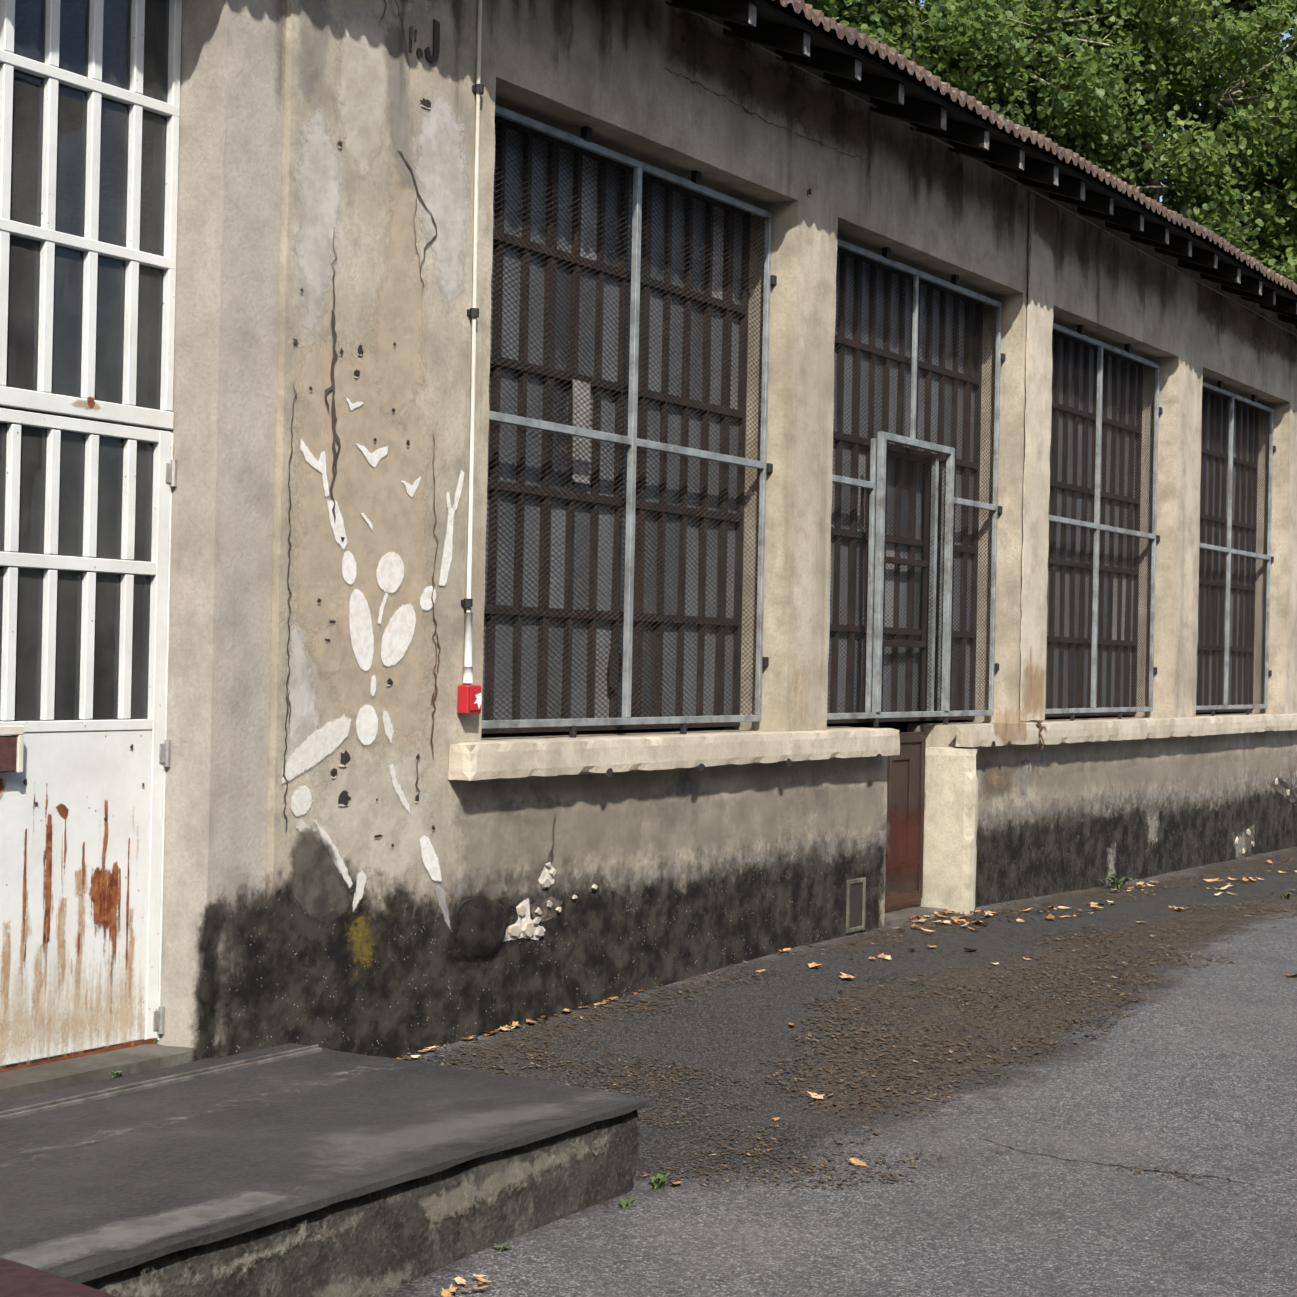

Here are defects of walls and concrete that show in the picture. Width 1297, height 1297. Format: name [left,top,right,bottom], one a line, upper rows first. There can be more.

crack [379,0,410,71]
peeling [295,0,429,331]
crack [397,150,438,289]
crack [283,236,341,830]
peeling [287,342,431,759]
rust [0,783,156,1072]
peeling [318,750,435,880]
leakage [192,782,888,1061]
spalling [505,862,577,942]
rust [885,812,921,877]
leakage [975,749,1297,908]
leakage [185,1214,361,1281]